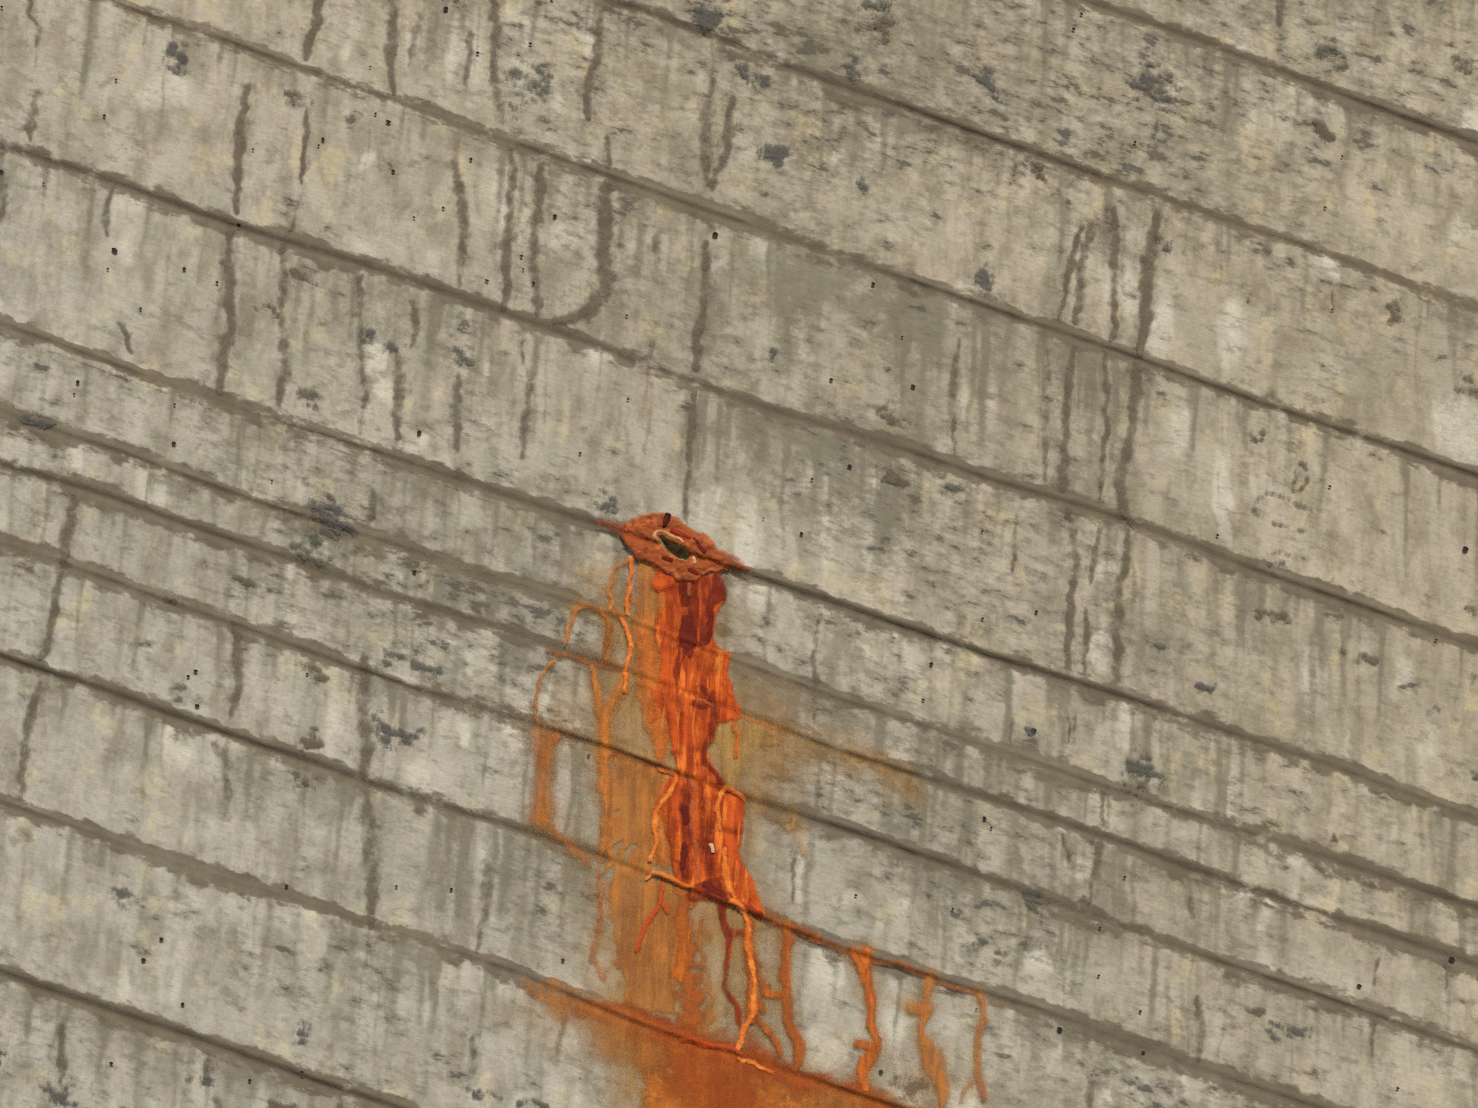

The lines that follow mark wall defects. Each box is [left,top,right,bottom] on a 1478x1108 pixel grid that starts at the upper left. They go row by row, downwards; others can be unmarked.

water stain [284,89,309,183]
water stain [303,0,323,59]
water stain [464,0,554,118]
water stain [216,83,251,394]
water stain [255,217,320,409]
water stain [358,274,419,439]
water stain [452,160,468,284]
water stain [500,145,518,309]
water stain [529,134,616,323]
water stain [1058,206,1173,680]
spalling [596,512,750,582]
corrosion [531,556,987,1108]